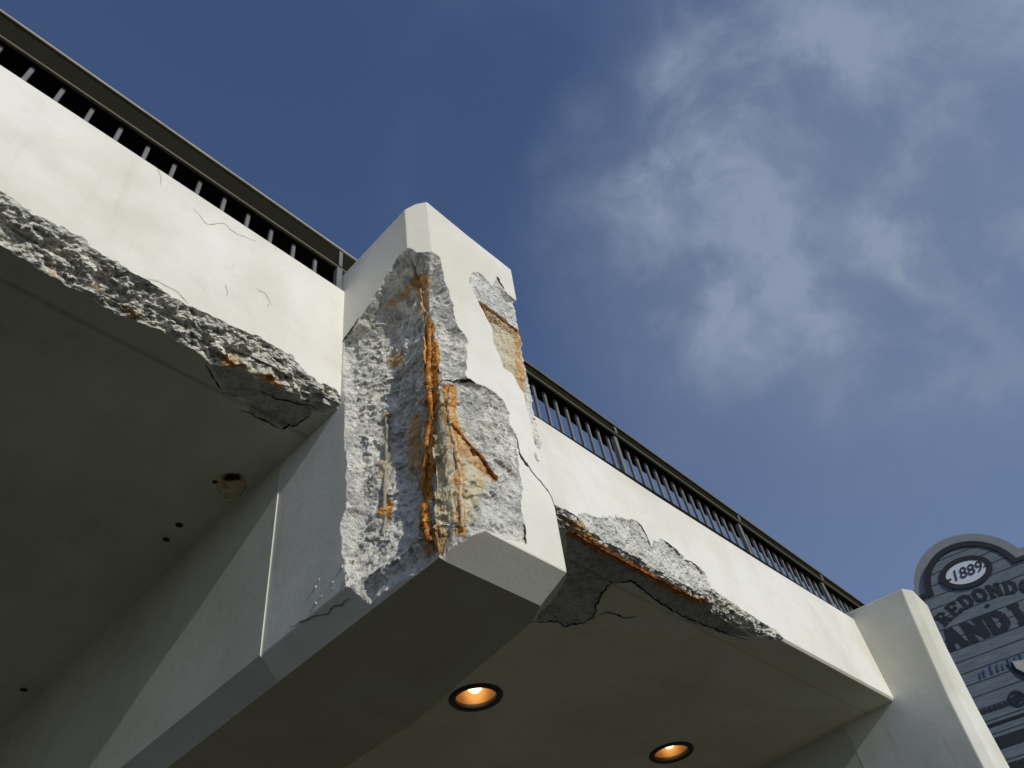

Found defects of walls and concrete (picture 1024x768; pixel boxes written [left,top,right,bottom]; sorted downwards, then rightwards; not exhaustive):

corrosion [222,352,282,391]
crack [206,362,318,430]
spalling [0,191,525,605]
corrosion [385,273,498,557]
corrosion [479,301,527,399]
spalling [468,271,542,449]
corrosion [376,413,393,521]
crack [515,434,585,526]
crack [291,599,349,627]
corrosion [564,519,709,606]
crack [540,580,745,640]
peeling [537,504,784,641]